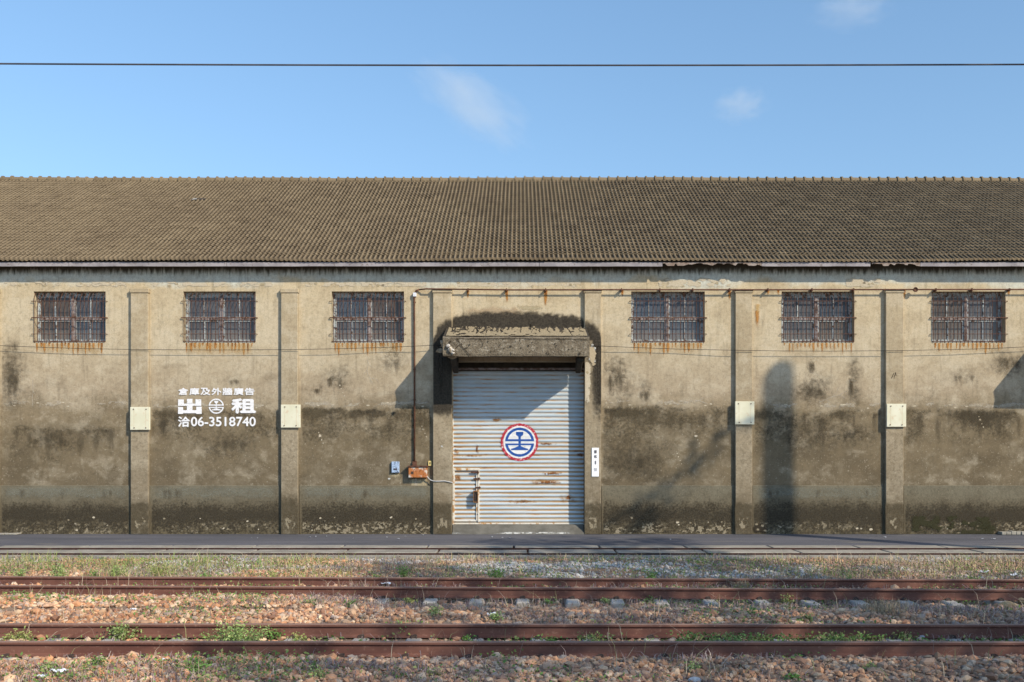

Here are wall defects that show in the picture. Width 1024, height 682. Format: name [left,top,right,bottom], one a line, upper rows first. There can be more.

corrosion [36,343,103,354]
corrosion [186,343,253,354]
corrosion [335,343,402,354]
corrosion [634,343,702,354]
spalling [436,326,596,403]
damp [155,403,208,429]
damp [755,380,854,442]
damp [949,403,1024,434]